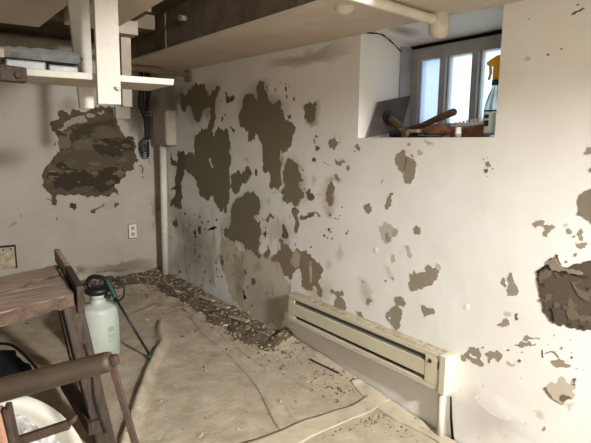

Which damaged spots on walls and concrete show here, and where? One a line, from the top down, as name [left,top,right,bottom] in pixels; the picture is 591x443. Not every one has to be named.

spalling [41,105,138,206]
spalling [395,142,417,184]
peeling [170,80,324,298]
spalling [577,189,591,223]
spalling [533,220,555,237]
water stain [220,238,291,330]
spalling [408,265,439,291]
spalling [501,273,519,296]
spalling [536,228,591,331]
spalling [386,296,406,330]
spalling [461,346,510,367]
peeling [546,376,577,405]